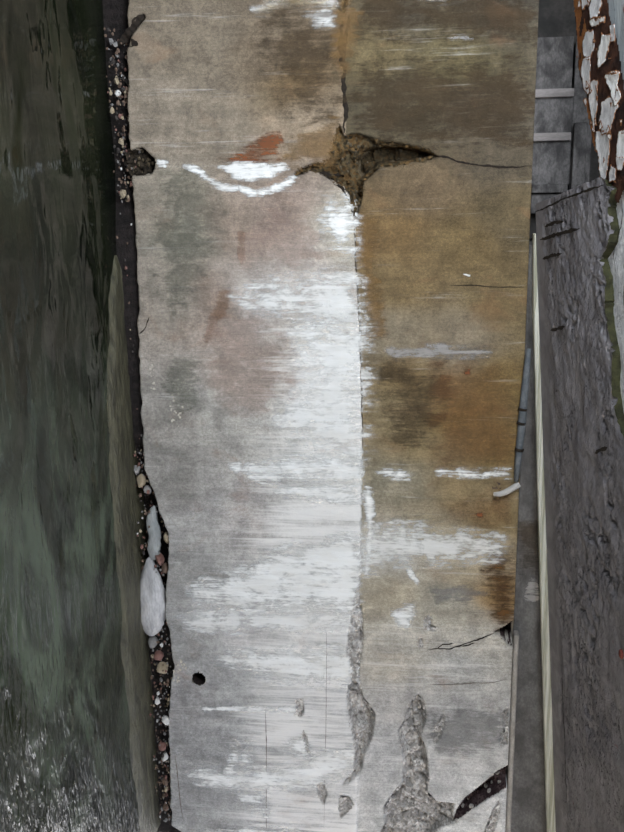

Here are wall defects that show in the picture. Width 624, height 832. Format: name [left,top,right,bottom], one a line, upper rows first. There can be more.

leakage [250,0,536,110]
leakage [335,59,535,145]
rust [574,0,624,203]
peeling [576,0,624,183]
rust [225,131,284,163]
spalling [294,121,434,220]
crack [429,154,524,168]
leakage [183,196,511,635]
leakage [216,643,360,685]
crack [430,633,494,650]
hole [337,796,354,820]
spalling [486,799,501,832]